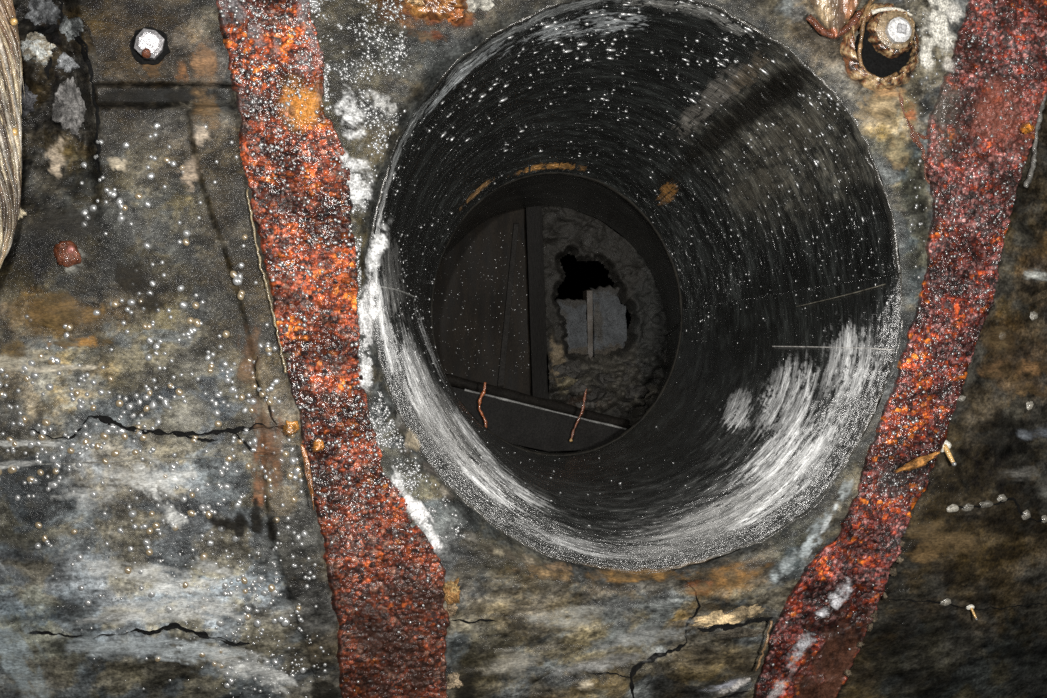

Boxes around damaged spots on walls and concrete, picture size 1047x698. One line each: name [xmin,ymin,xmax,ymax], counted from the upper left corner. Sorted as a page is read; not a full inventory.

water stain [430,0,640,108]
water stain [651,3,741,32]
water stain [336,96,365,138]
corrosion [180,0,450,698]
water stain [342,116,545,510]
corrosion [753,0,1047,698]
crack [30,356,284,455]
water stain [392,473,442,549]
crack [952,497,1047,523]
crack [28,622,250,647]
crack [587,581,774,698]
spalling [690,604,767,641]